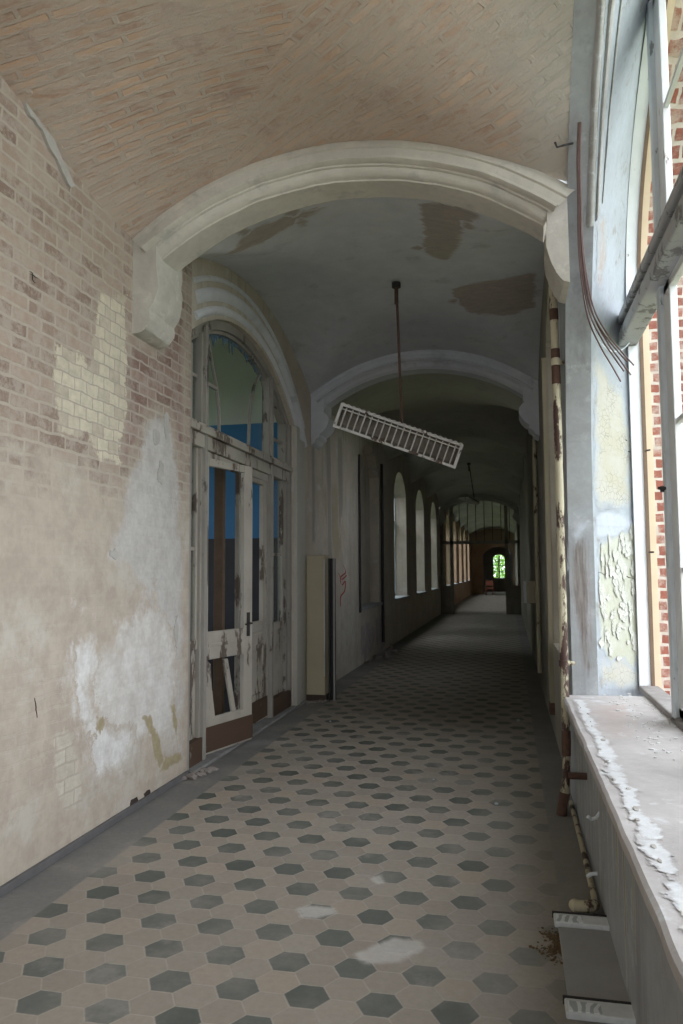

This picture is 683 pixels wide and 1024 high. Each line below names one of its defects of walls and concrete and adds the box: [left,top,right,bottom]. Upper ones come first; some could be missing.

flaking render [409,201,483,261]
flaking render [446,271,538,316]
peeling [51,288,187,775]
damp [54,577,183,792]
peeling [572,524,683,931]